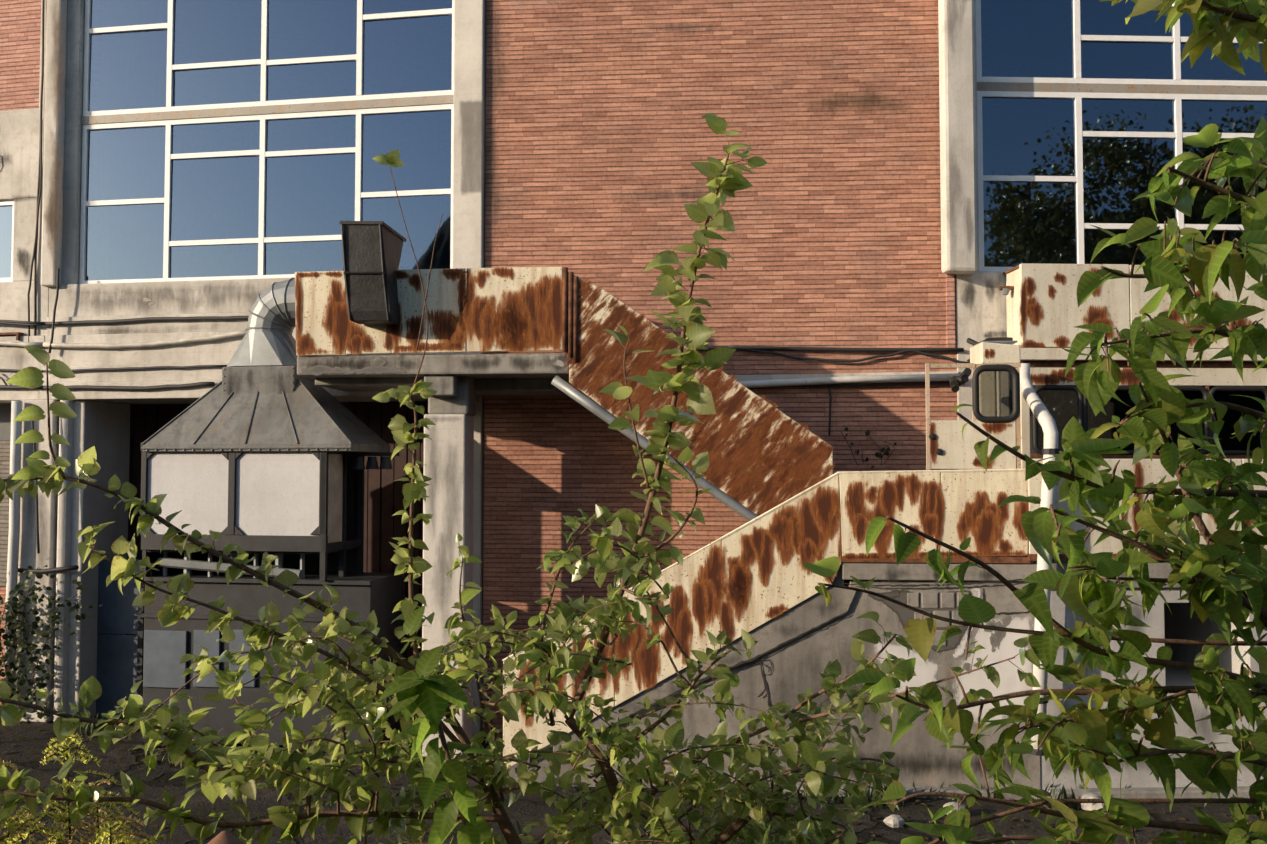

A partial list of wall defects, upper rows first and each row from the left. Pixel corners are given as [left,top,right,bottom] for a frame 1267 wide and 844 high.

corrosion [1019,272,1069,348]
corrosion [1083,267,1114,340]
corrosion [295,267,1028,727]